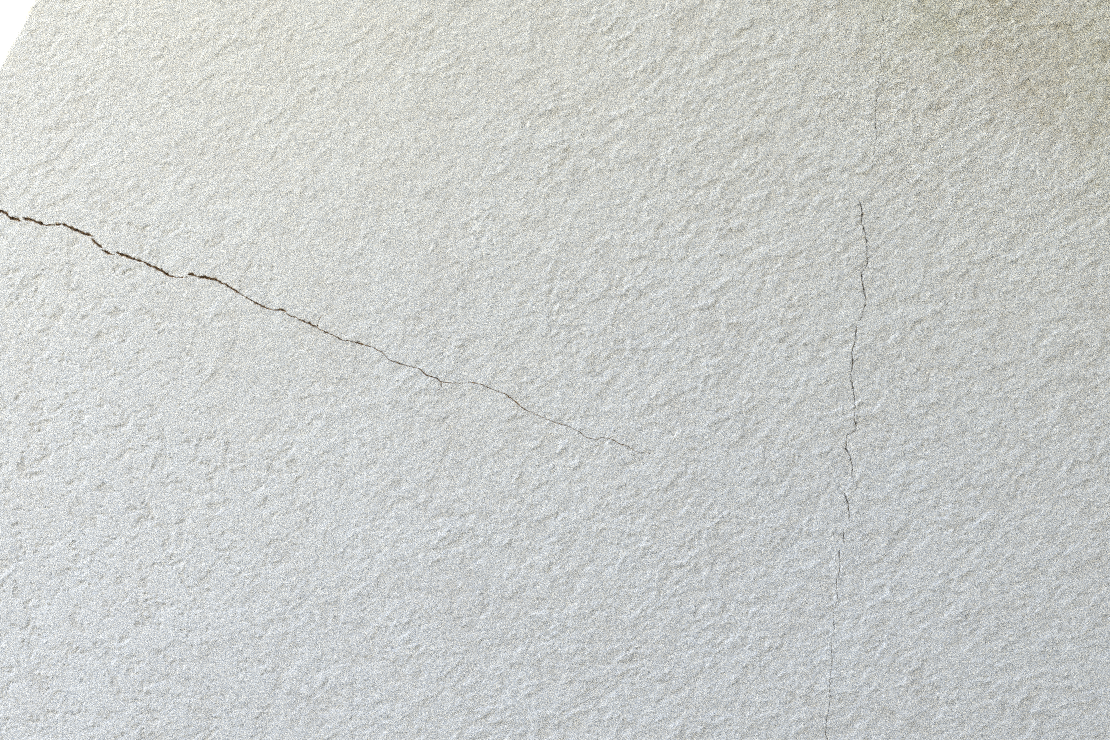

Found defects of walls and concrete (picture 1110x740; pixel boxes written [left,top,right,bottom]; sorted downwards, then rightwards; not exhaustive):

crack [0,205,657,459]